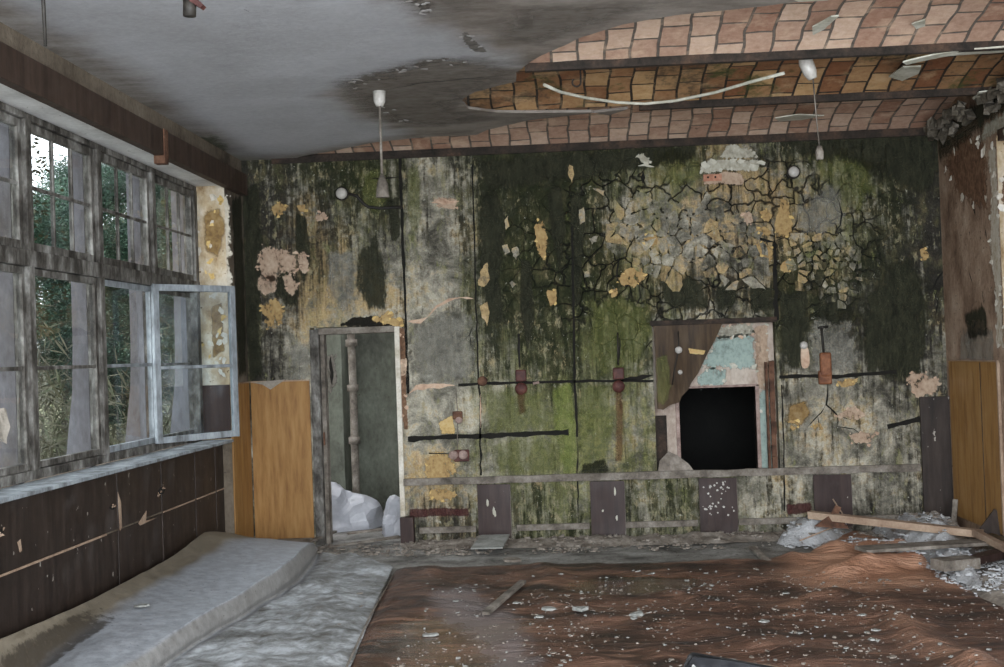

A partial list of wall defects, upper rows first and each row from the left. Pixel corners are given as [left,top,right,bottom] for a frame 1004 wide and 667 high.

flaking render [317,0,1004,154]
peeling [197,194,233,377]
water stain [232,184,263,380]
peeling [255,244,309,330]
water stain [276,212,311,307]
water stain [356,197,400,309]
water stain [476,146,701,323]
crack [605,189,862,320]
peeling [717,323,769,390]
water stain [661,258,928,384]
peeling [906,371,942,398]
peeling [942,113,1004,349]